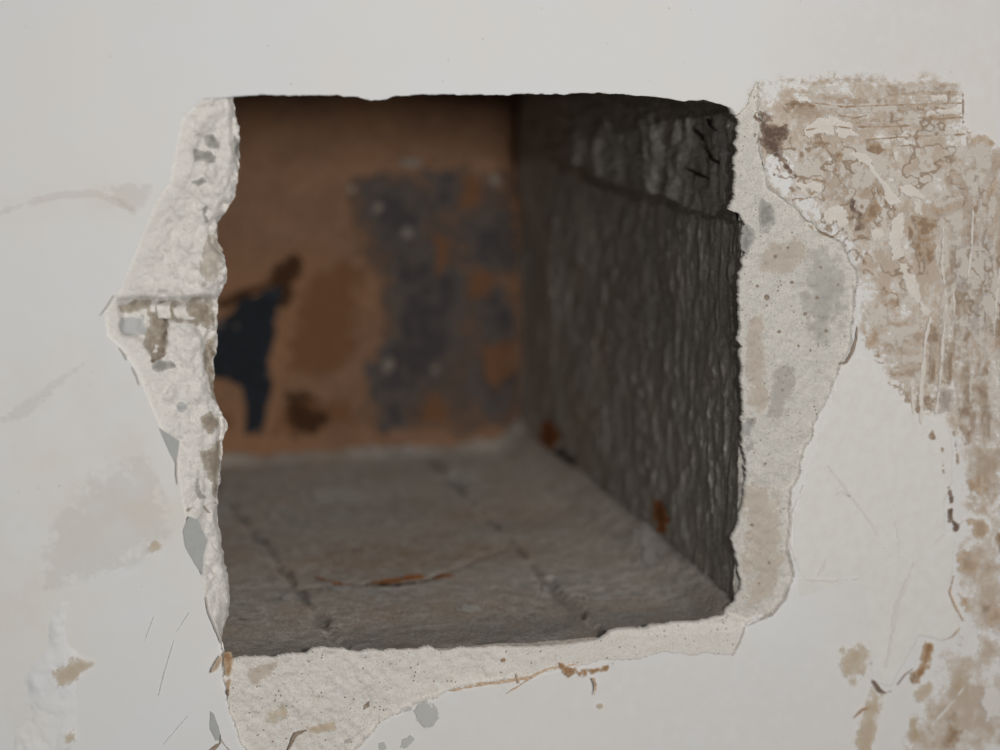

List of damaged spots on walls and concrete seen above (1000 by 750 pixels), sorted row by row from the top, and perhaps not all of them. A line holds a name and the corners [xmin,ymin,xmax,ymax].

water stain [53,657,92,686]
flaking render [105,81,1000,750]
corrosion [559,663,614,709]
water stain [749,77,1000,750]